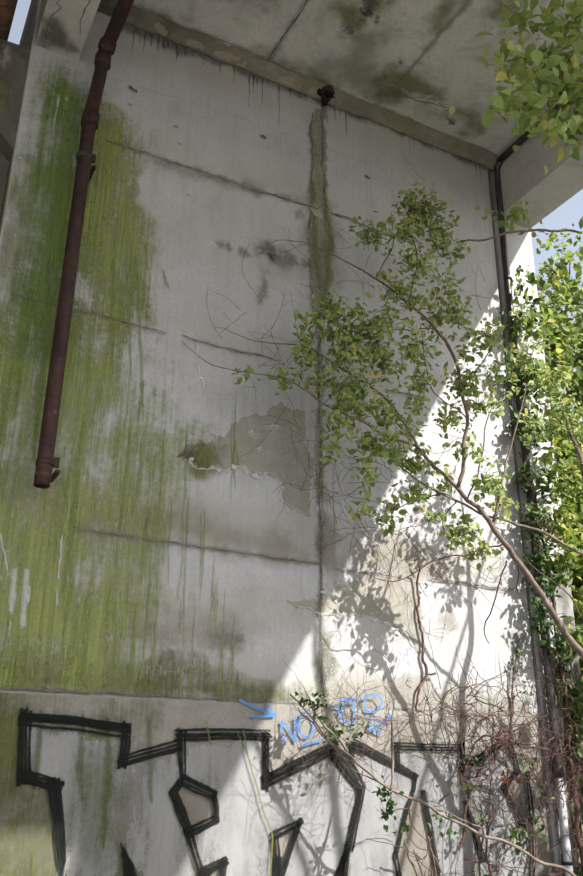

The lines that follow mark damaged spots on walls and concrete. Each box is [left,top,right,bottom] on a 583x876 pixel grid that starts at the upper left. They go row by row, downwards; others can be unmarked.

damp [123,23,222,73]
damp [233,67,304,99]
damp [360,0,379,23]
damp [308,99,335,693]
peeling [176,402,315,517]
peeling [287,571,426,653]
damp [80,621,289,702]